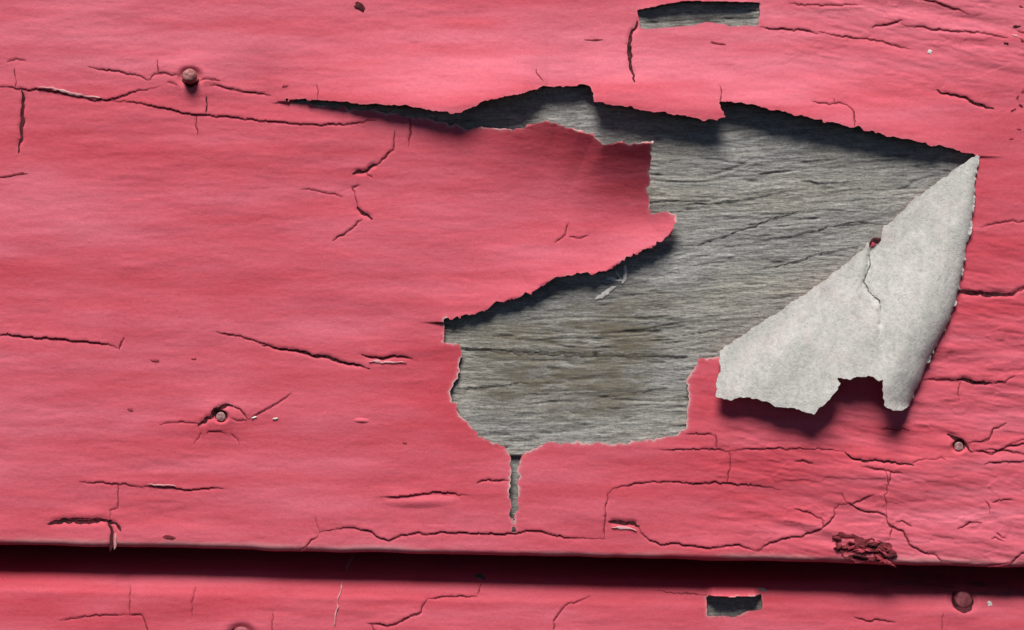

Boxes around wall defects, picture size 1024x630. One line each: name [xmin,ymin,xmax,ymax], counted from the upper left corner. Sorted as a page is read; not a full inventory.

peeling [637,1,760,29]
crack [627,20,638,82]
crack [0,58,369,153]
crack [309,120,412,241]
peeling [282,39,980,478]
crack [0,333,124,349]
crack [216,331,413,369]
crack [159,393,290,442]
crack [47,481,225,551]
crack [302,422,1024,567]
spalling [832,532,897,568]
peeling [706,588,767,617]